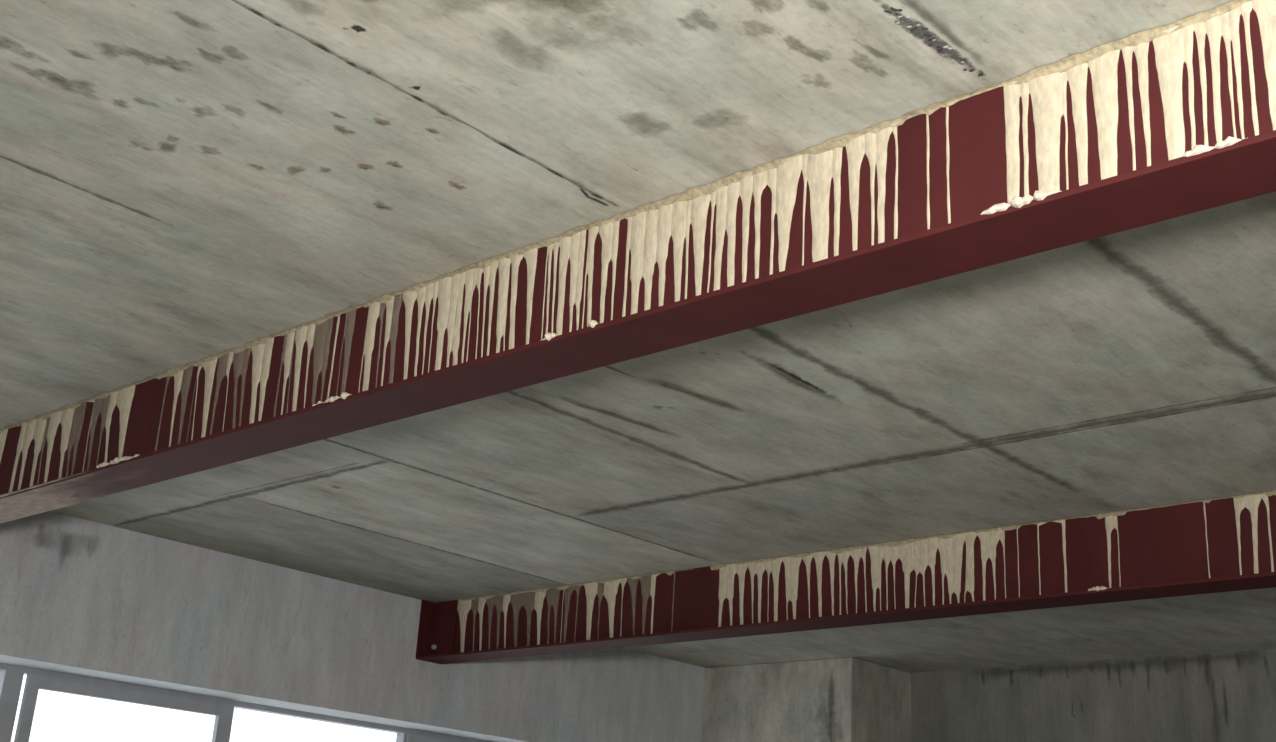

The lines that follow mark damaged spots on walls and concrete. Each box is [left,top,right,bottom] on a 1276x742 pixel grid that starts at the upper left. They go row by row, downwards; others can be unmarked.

crack [233,0,617,206]
peeling [885,7,983,76]
leakage [0,0,1276,524]